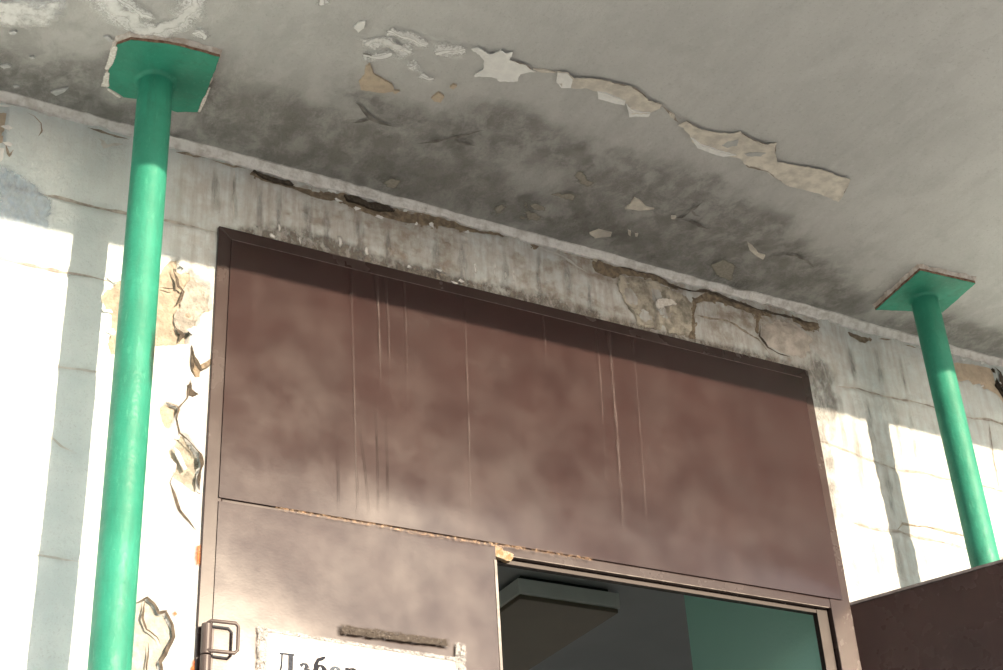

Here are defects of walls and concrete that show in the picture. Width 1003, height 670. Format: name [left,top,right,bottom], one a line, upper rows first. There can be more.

peeling [471,47,851,202]
flaking render [250,170,504,237]
flaking render [101,276,121,355]
flaking render [155,261,209,346]
water stain [241,224,838,469]
crack [591,259,811,357]
crack [839,386,934,408]
flaking render [160,380,204,531]
crack [821,441,951,480]
crack [966,416,1003,492]
crack [852,522,966,549]
flaking render [132,596,175,670]